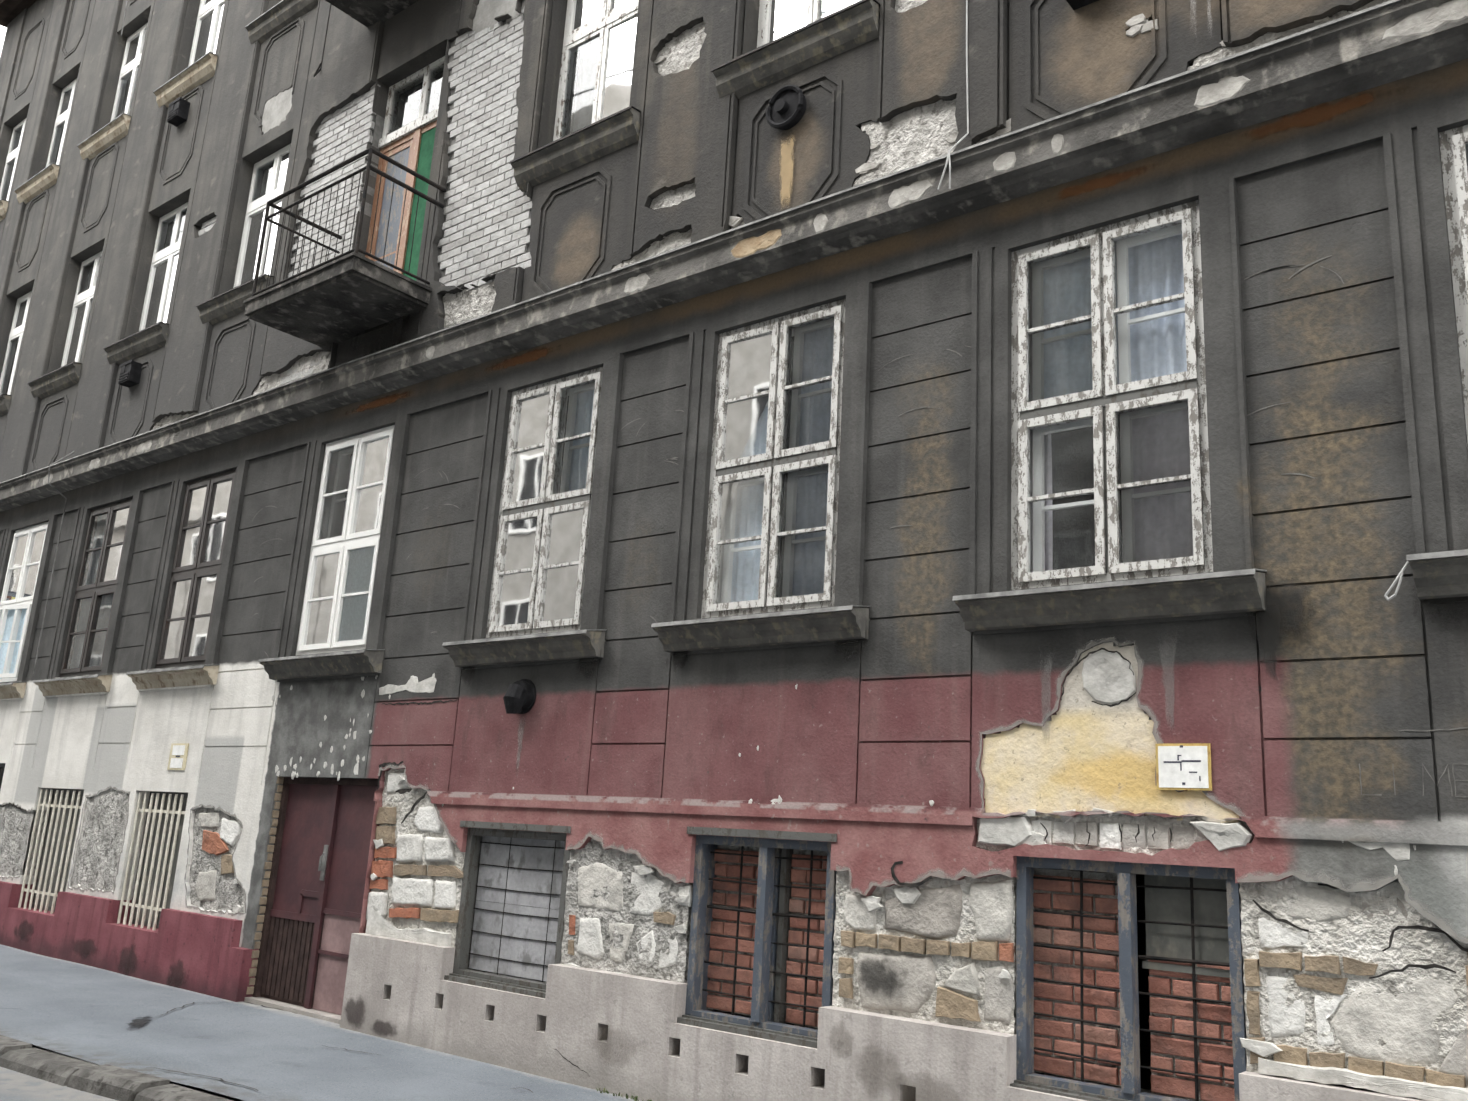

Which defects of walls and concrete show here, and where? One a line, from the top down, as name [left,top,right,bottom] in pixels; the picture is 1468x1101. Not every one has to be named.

flaking render [654,21,707,76]
flaking render [288,83,380,278]
flaking render [438,6,532,329]
flaking render [853,99,958,208]
flaking render [185,805,246,916]
flaking render [275,673,465,947]
flaking render [561,833,693,983]
flaking render [832,867,1016,1034]
peeling [976,638,1255,856]
crack [1252,899,1309,932]
flaking render [1237,841,1468,1101]
crack [1369,925,1468,979]